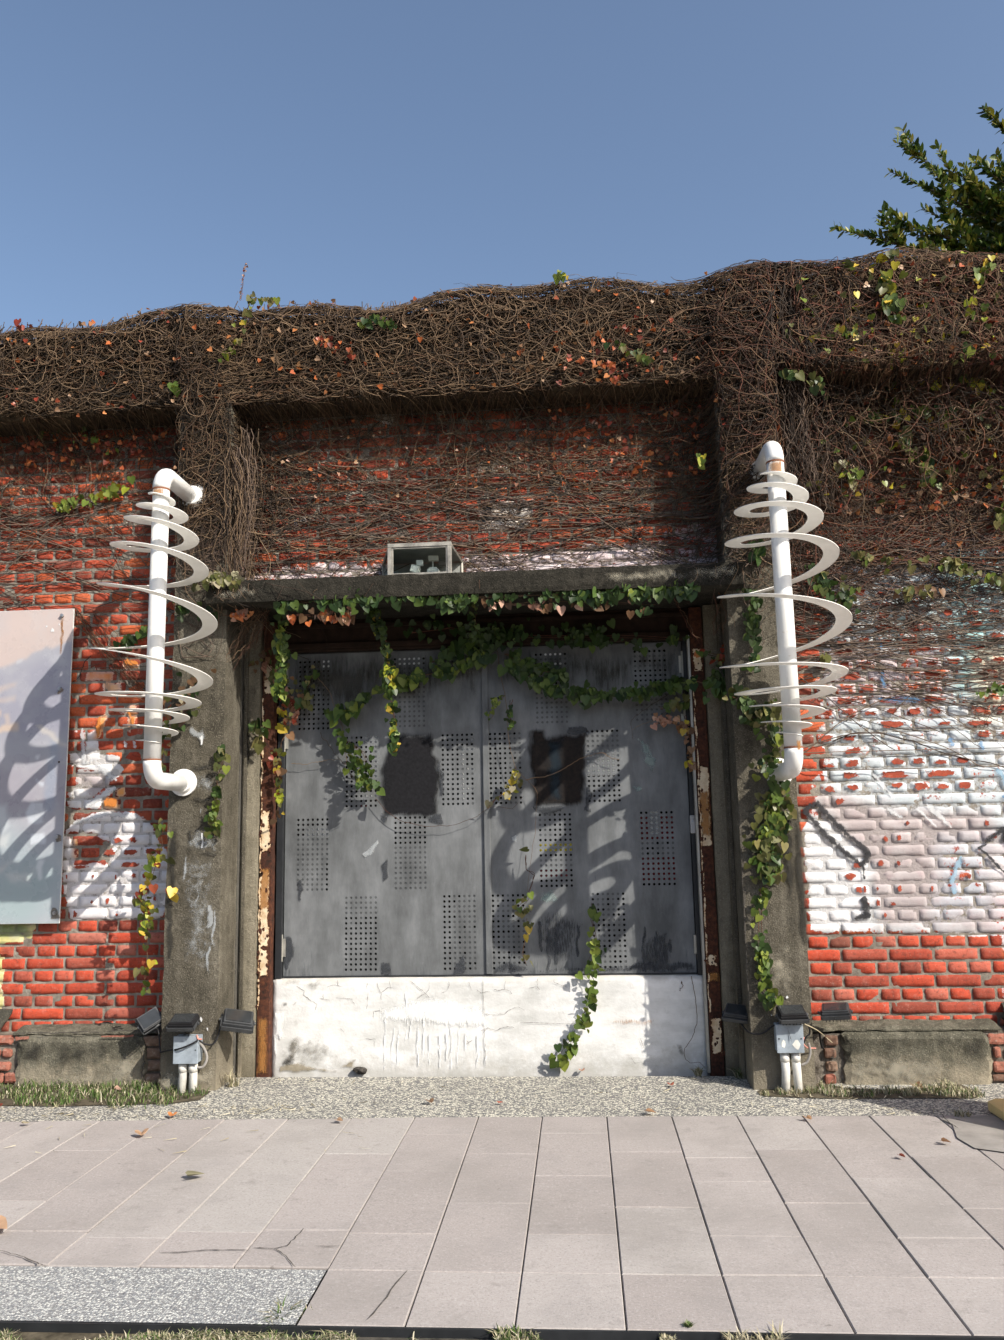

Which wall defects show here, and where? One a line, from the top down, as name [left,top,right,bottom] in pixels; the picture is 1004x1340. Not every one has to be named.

peeling [821,590,1004,728]
peeling [969,705,1004,737]
peeling [821,735,861,805]
peeling [882,757,973,790]
peeling [66,837,156,879]
rust [260,869,269,909]
peeling [845,863,902,918]
rust [257,1020,267,1073]
crack [297,979,576,1065]